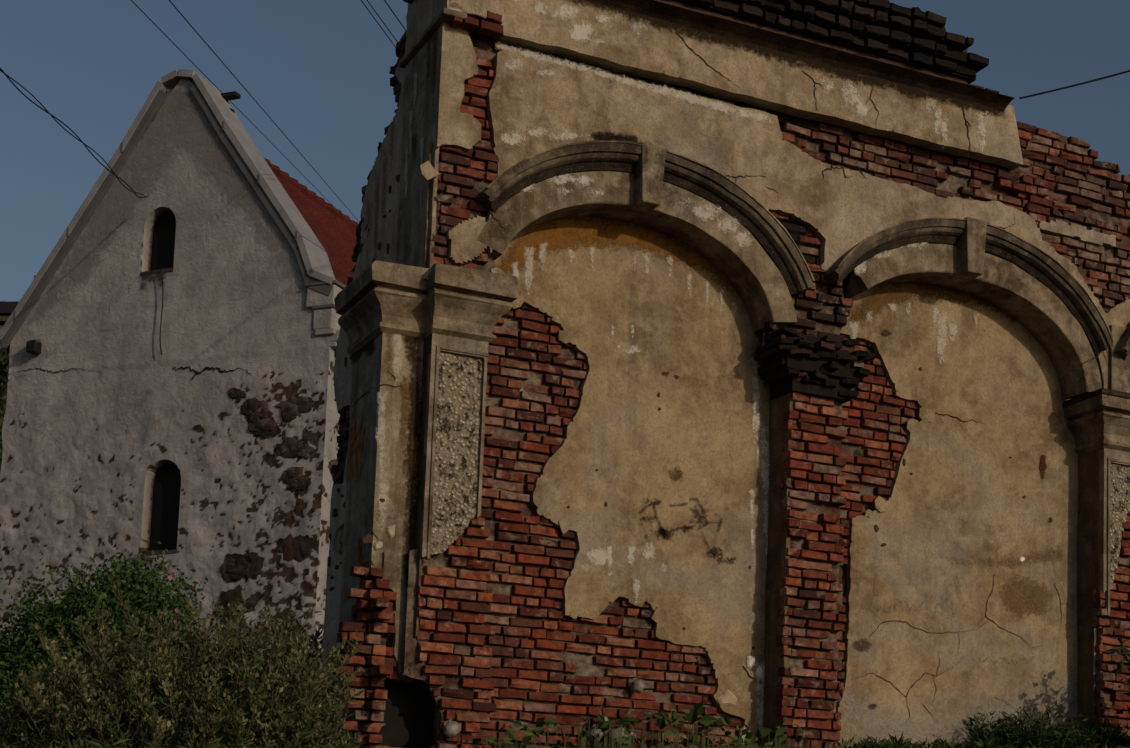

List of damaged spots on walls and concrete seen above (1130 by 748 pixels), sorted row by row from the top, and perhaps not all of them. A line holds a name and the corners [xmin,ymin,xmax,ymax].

crack [677,32,739,87]
spalling [419,29,507,280]
spalling [760,109,1130,313]
crack [962,108,971,156]
crack [18,366,101,374]
crack [172,366,251,381]
spalling [228,387,315,492]
spalling [322,291,743,748]
spalling [746,211,935,748]
spalling [217,552,304,657]
crack [852,577,1062,721]
spalling [1092,512,1130,738]